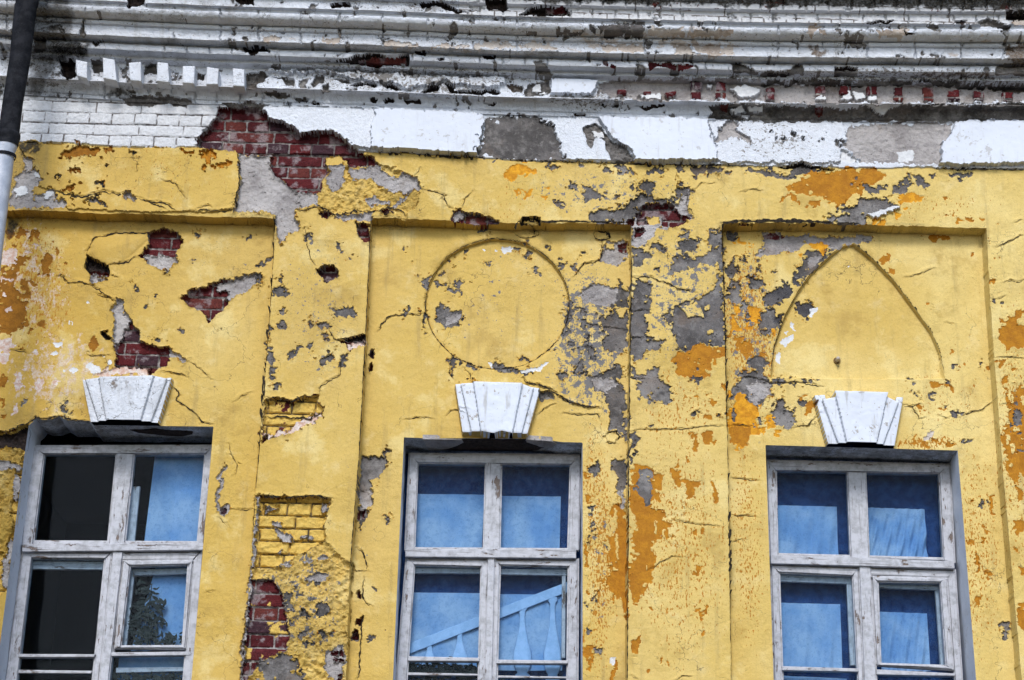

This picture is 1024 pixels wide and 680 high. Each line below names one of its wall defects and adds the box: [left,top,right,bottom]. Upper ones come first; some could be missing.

peeling [0,227,67,350]
peeling [9,139,114,209]
spalling [88,298,186,377]
crack [53,152,241,213]
spalling [139,227,183,274]
crack [166,359,213,425]
spalling [181,257,375,444]
spalling [181,71,566,245]
crack [222,205,945,680]
peeling [336,0,1024,509]
peeling [973,309,1024,552]
spalling [239,495,386,680]